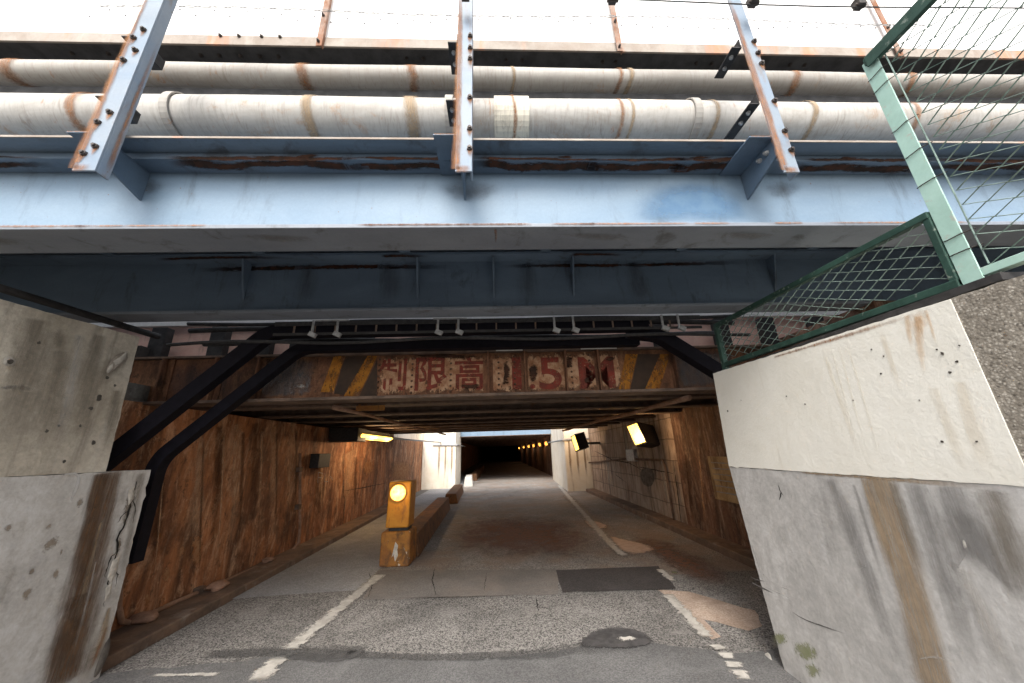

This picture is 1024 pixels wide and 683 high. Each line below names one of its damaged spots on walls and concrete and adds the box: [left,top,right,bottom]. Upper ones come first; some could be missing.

corrosion [65,9,144,169]
corrosion [404,64,419,138]
corrosion [735,16,910,173]
corrosion [176,154,440,171]
corrosion [483,156,731,173]
crack [103,482,137,604]